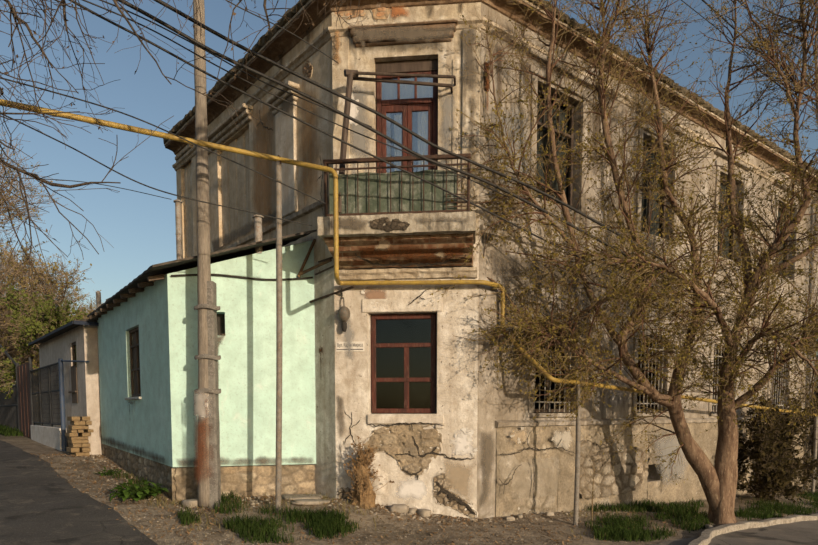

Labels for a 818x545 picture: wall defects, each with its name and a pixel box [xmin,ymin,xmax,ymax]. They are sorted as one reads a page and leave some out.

crack [355,253,465,267]
crack [345,412,477,515]
spalling [362,424,478,519]
crack [499,429,574,504]
spalling [551,427,649,500]